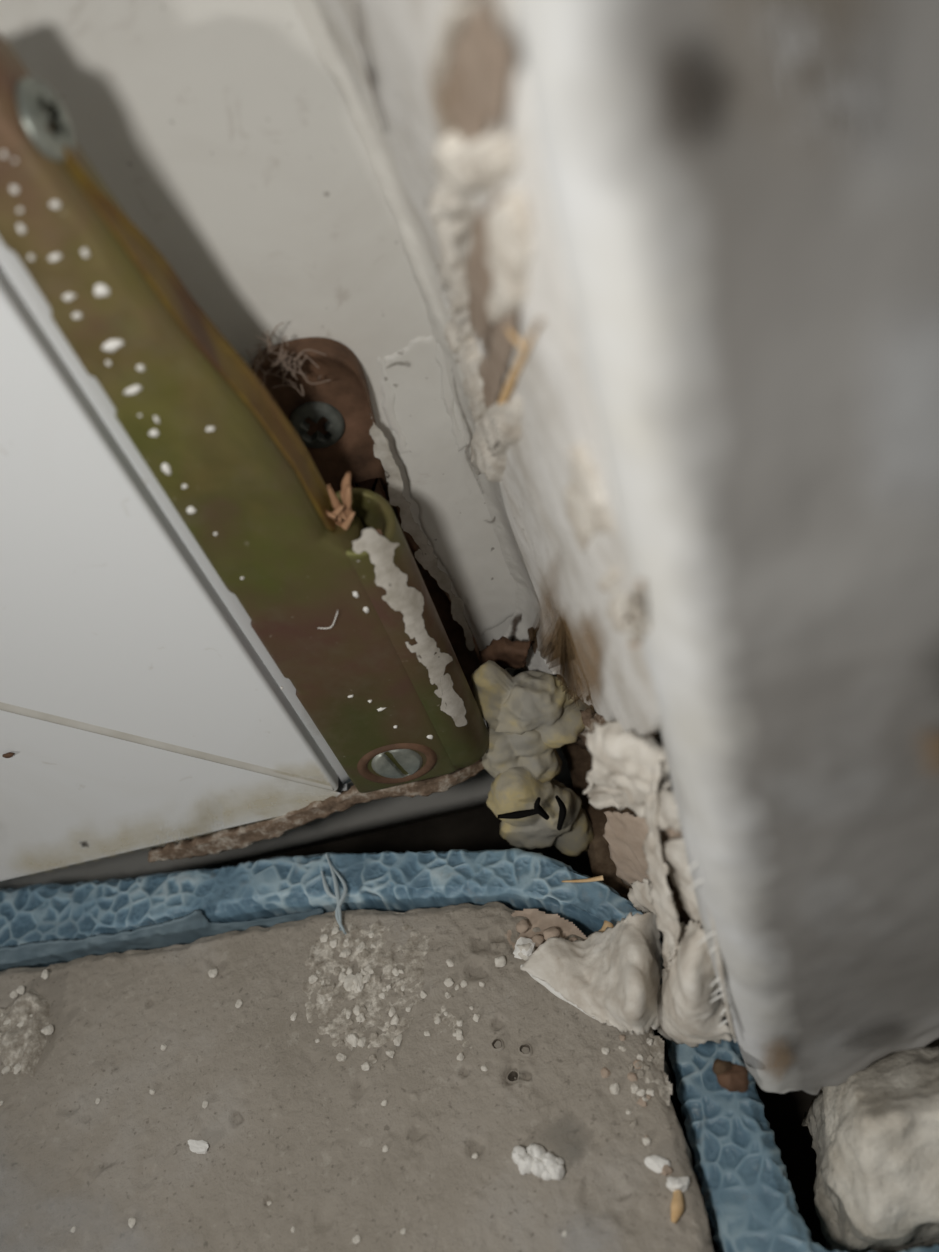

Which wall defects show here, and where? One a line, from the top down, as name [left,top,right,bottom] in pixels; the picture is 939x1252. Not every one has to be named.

peeling [377,0,533,669]
spalling [619,580,651,647]
peeling [491,708,737,1138]
peeling [644,1155,690,1193]